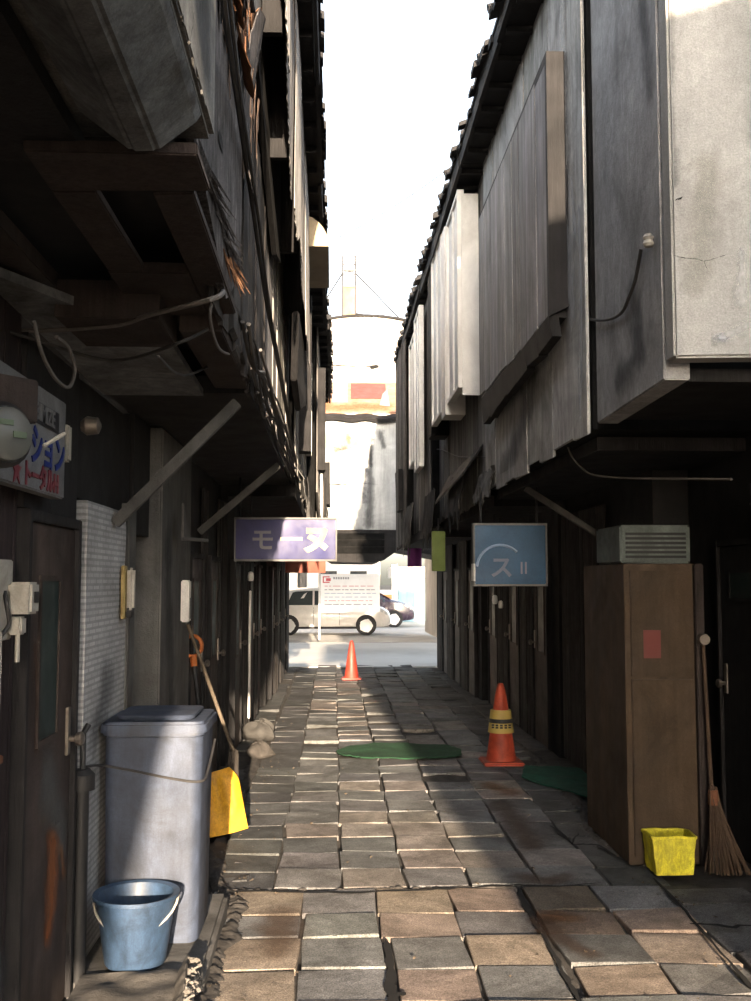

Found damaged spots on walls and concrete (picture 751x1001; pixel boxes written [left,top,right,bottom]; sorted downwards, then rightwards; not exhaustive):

peeling [219,0,262,159]
crack [550,825,627,862]
crack [211,882,601,1001]
crack [653,878,751,988]